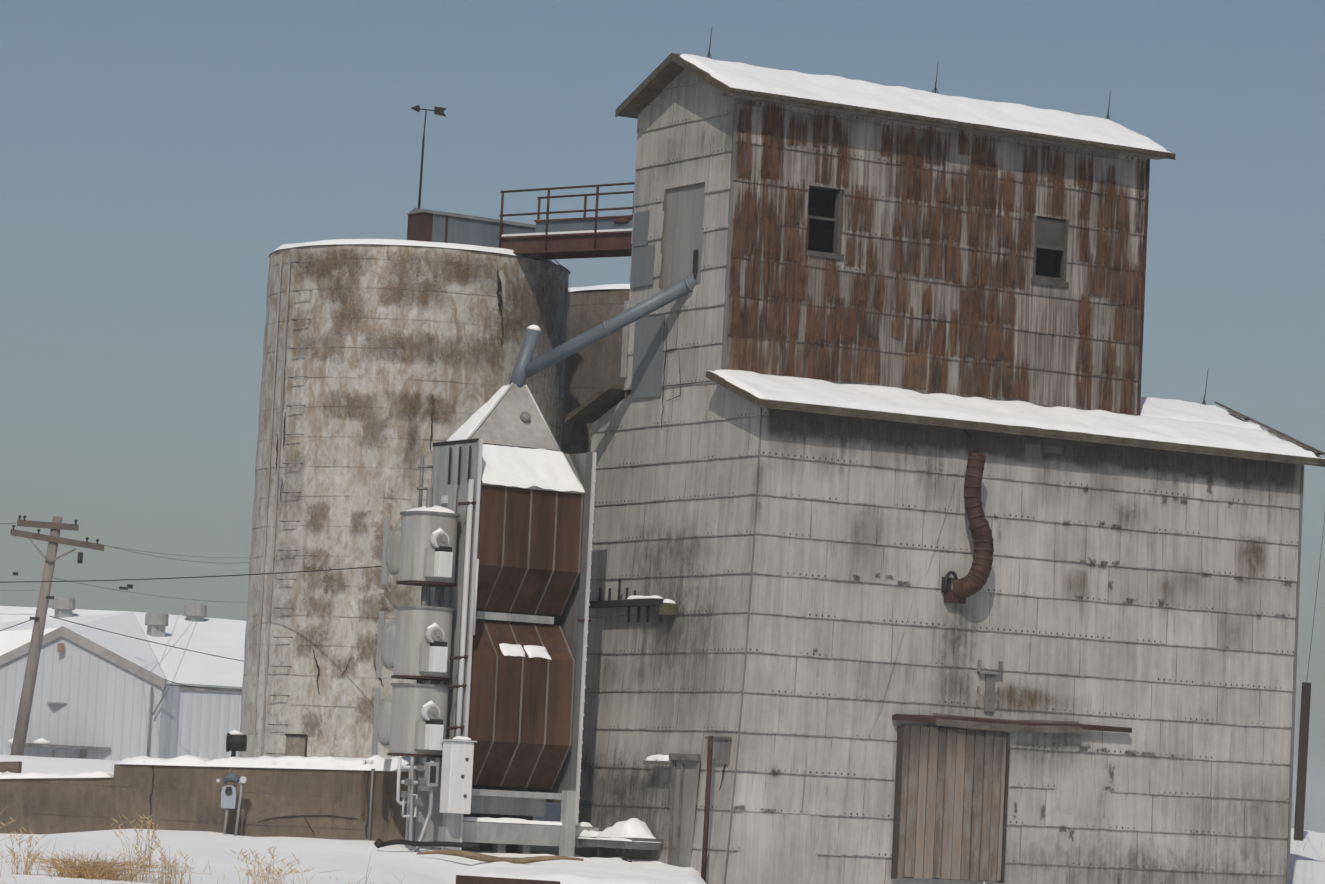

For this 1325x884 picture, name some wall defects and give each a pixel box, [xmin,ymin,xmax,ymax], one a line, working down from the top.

crack [496,270,504,346]
rust [729,100,1147,414]